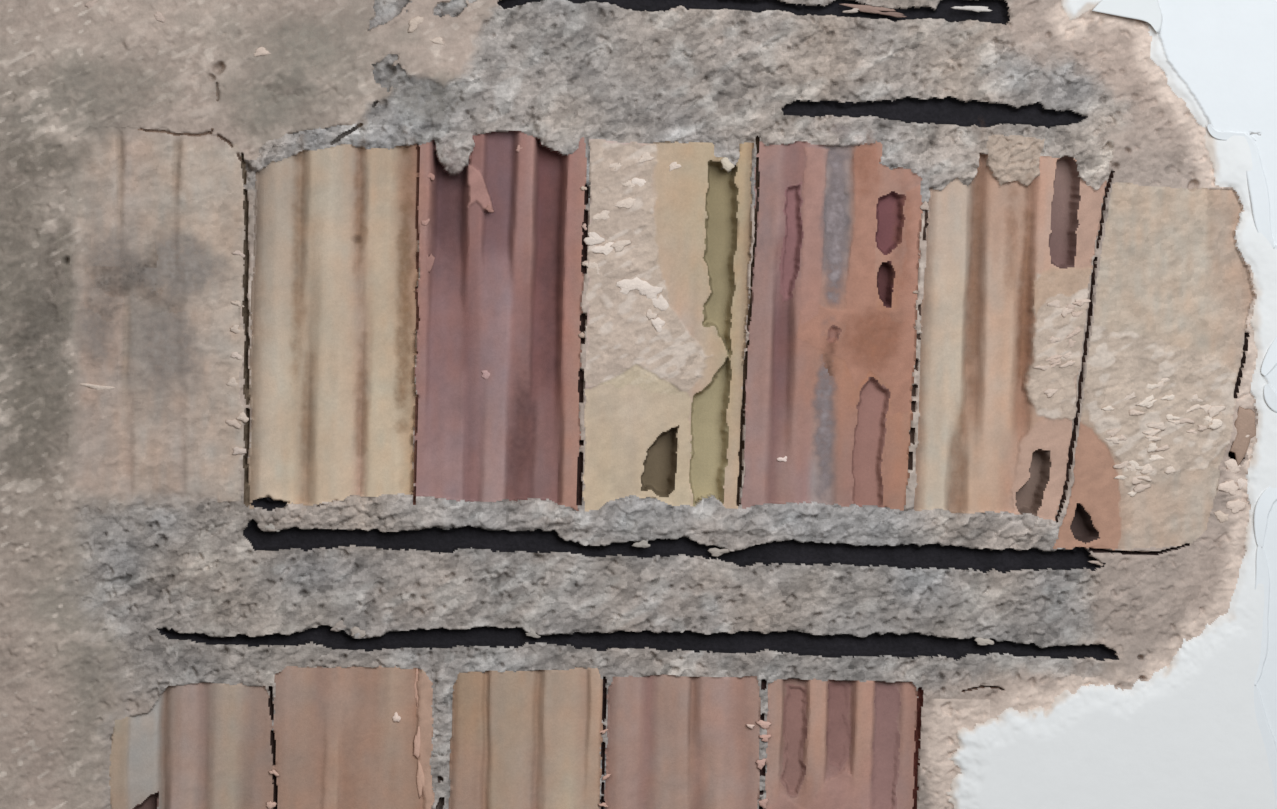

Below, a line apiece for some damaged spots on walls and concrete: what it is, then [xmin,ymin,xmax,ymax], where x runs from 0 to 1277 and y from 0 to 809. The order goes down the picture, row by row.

crack [497,0,1010,25]
peeling [1092,0,1162,33]
crack [330,101,378,145]
crack [781,96,1088,129]
spalling [873,190,909,313]
spalling [1046,152,1086,272]
crack [138,129,1190,573]
spalling [638,157,742,507]
spalling [1013,447,1055,516]
spalling [1067,500,1104,547]
crack [158,620,1119,809]
spalling [778,680,856,800]